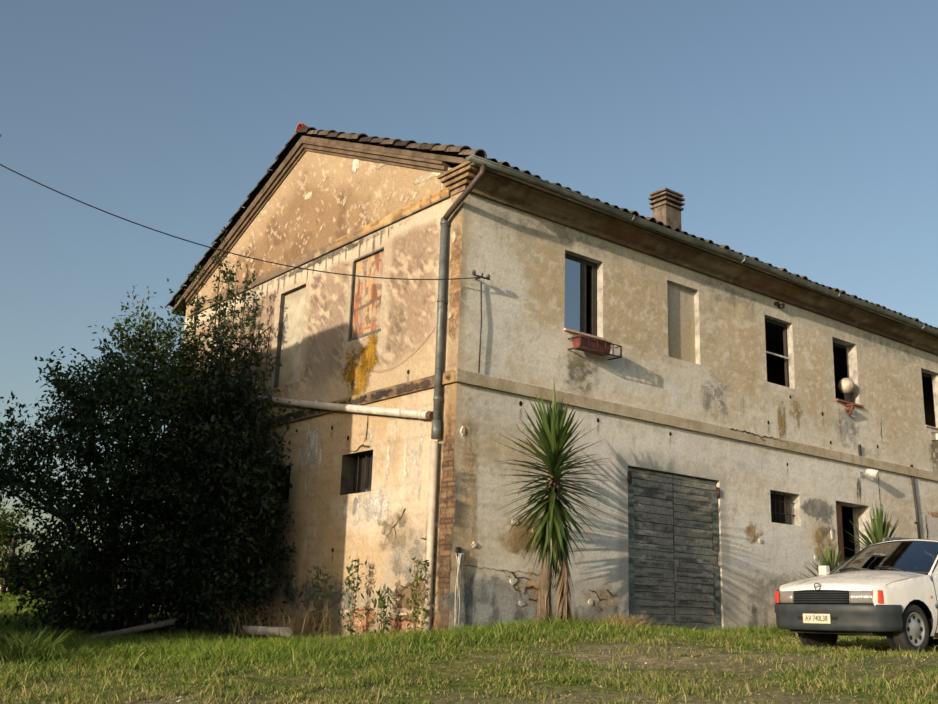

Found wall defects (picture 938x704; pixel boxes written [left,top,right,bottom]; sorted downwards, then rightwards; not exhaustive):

flaking render [345,171,443,228]
crack [380,509,406,548]
flaking render [584,587,620,612]